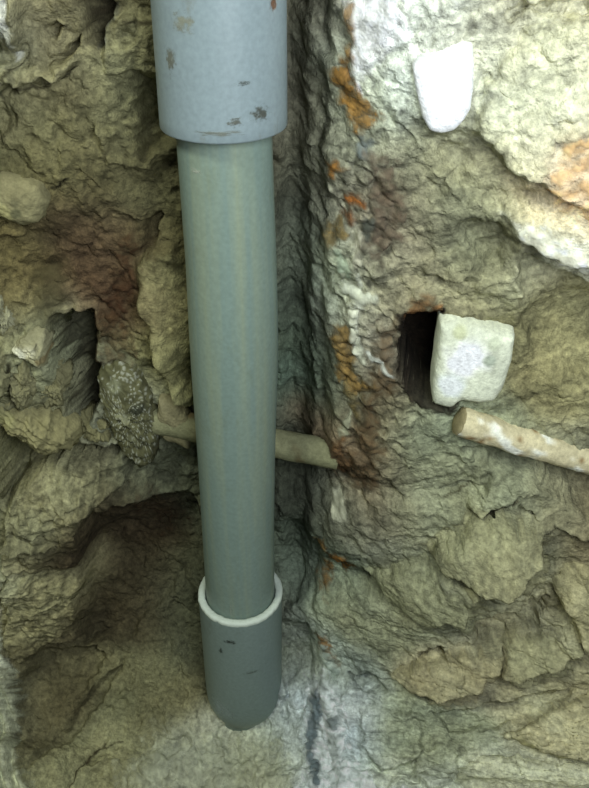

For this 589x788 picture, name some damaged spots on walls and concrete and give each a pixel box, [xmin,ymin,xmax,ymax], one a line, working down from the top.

rust [343,3,354,32]
rust [332,42,377,133]
rust [323,194,362,244]
spalling [57,308,102,403]
rust [331,325,368,417]
rust [331,437,353,472]
leakage [121,734,284,788]
leakage [295,645,376,788]